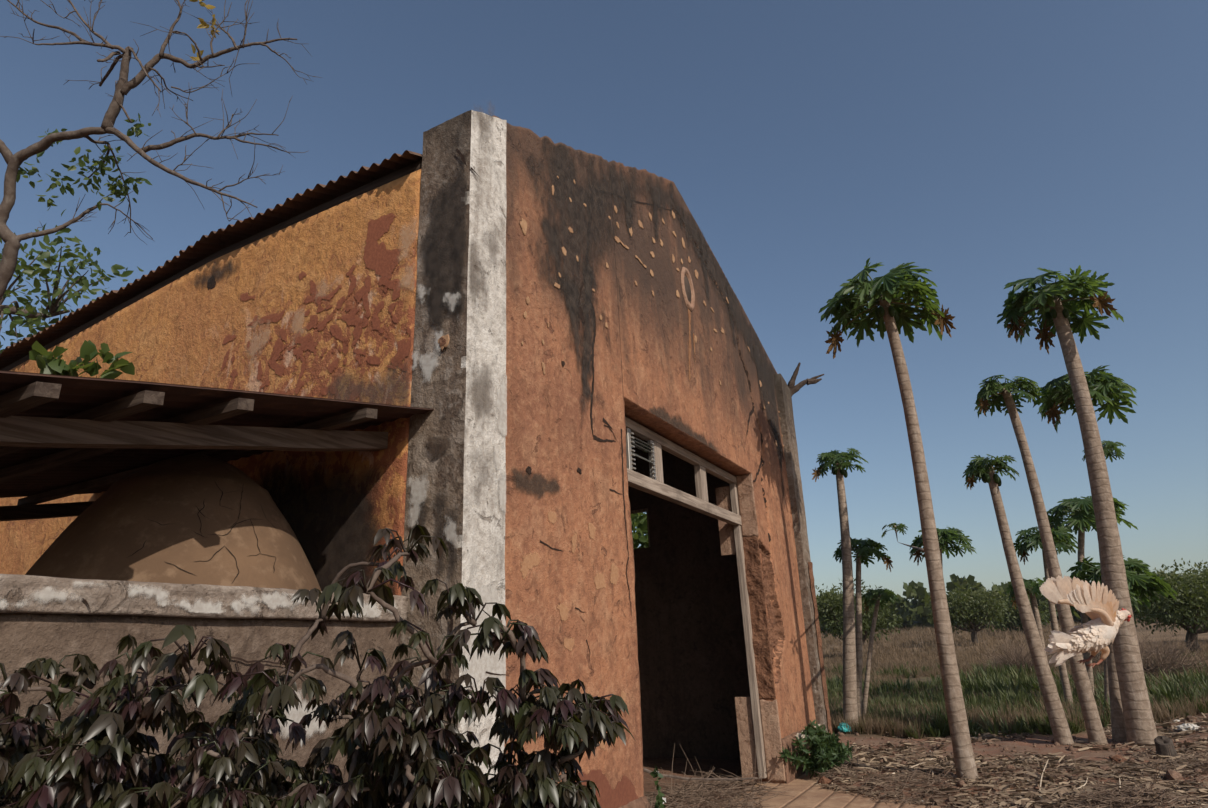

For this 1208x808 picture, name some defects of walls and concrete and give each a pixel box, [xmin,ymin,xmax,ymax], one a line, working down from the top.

damp [422,153,478,334]
peeling [221,213,450,401]
peeling [443,292,459,311]
damp [533,138,784,495]
crack [130,482,277,594]
peeling [409,478,426,526]
damp [418,493,458,576]
damp [428,437,450,456]
peeling [445,522,458,547]
crack [579,220,633,619]
flaking render [742,536,785,699]
peeling [575,769,638,808]